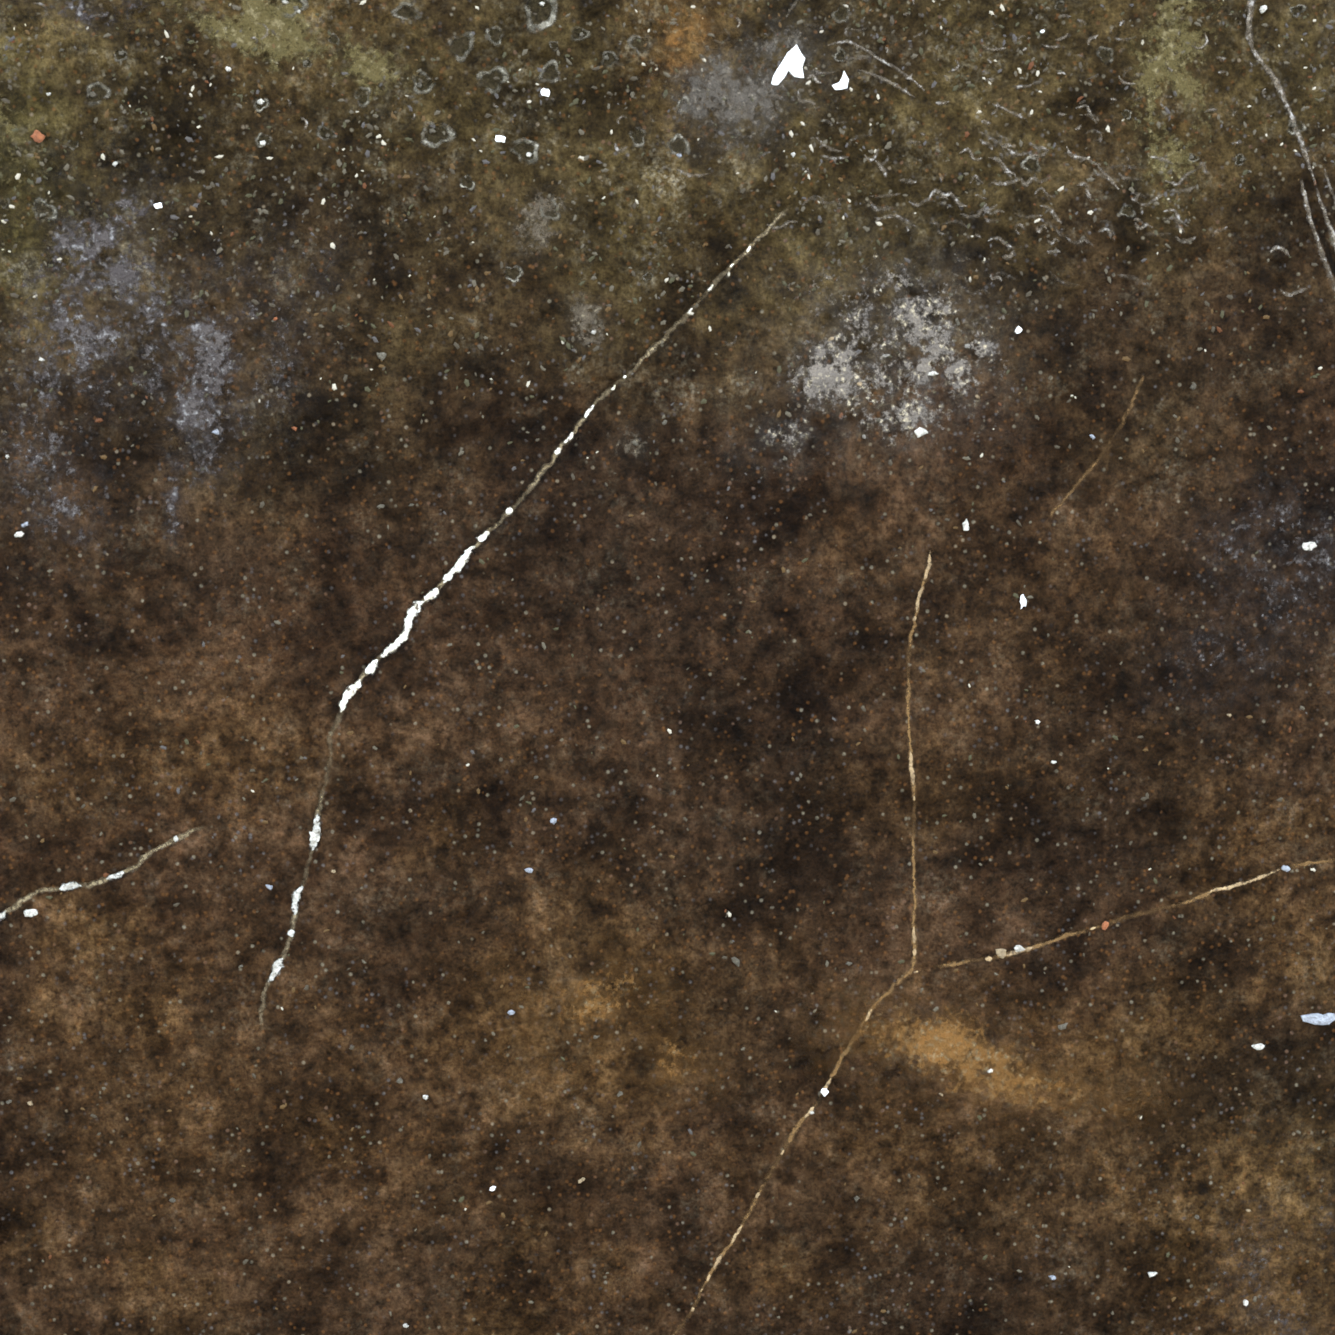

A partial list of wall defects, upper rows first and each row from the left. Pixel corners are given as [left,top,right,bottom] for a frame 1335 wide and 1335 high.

crack [1247,0,1335,288]
leakage [767,256,1005,461]
crack [329,213,783,736]
crack [909,552,932,647]
crack [0,829,194,922]
crack [260,886,303,1022]
crack [310,790,324,850]
crack [675,679,1331,1333]